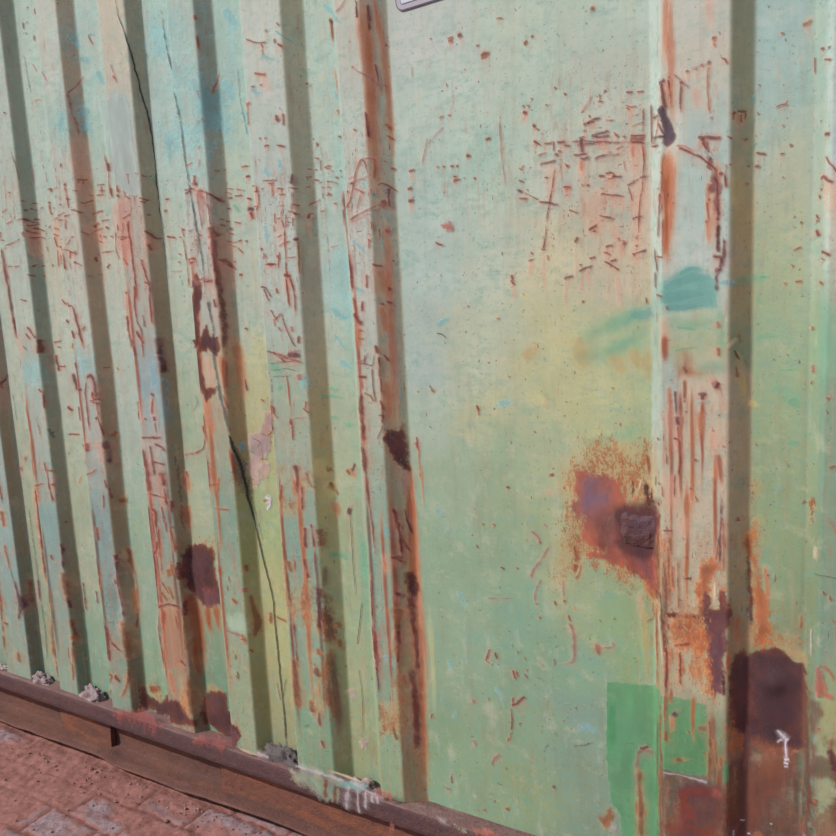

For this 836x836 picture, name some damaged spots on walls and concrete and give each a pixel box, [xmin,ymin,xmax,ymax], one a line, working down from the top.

rust [67,360,118,463]
crack [115,1,168,286]
rust [104,214,263,746]
rust [181,175,234,411]
crack [161,11,287,744]
rust [343,200,433,750]
rust [650,60,712,297]
rust [530,361,836,836]